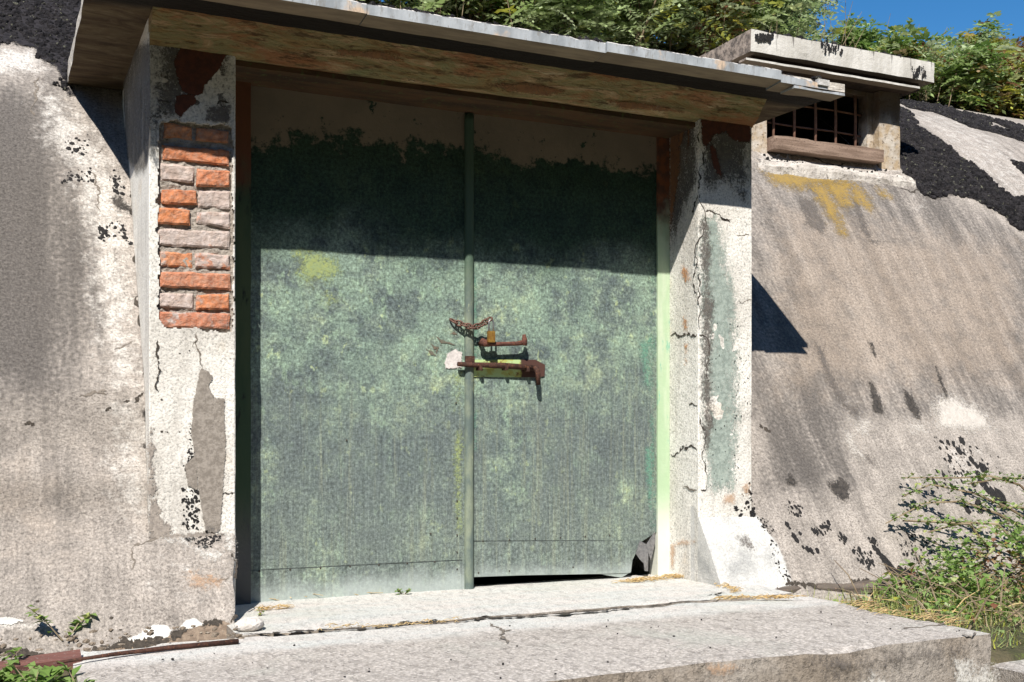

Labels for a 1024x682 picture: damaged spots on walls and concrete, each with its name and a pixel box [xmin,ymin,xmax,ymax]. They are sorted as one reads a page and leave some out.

spalling [155,48,234,333]
crack [670,132,748,377]
damp [800,198,826,234]
peeling [144,368,236,561]
crack [671,402,708,491]